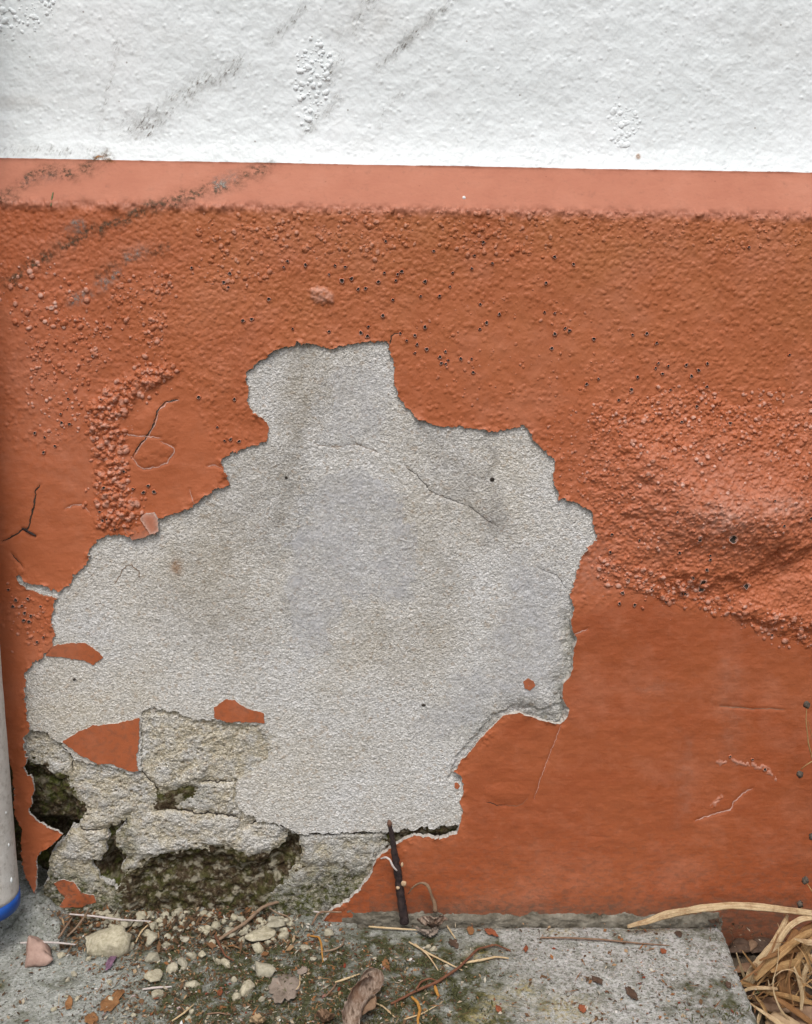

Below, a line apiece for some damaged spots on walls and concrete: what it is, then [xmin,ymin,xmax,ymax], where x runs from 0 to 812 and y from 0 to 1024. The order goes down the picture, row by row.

crack [127,399,178,469]
crack [2,485,40,569]
peeling [9,340,597,920]
crack [697,788,753,820]